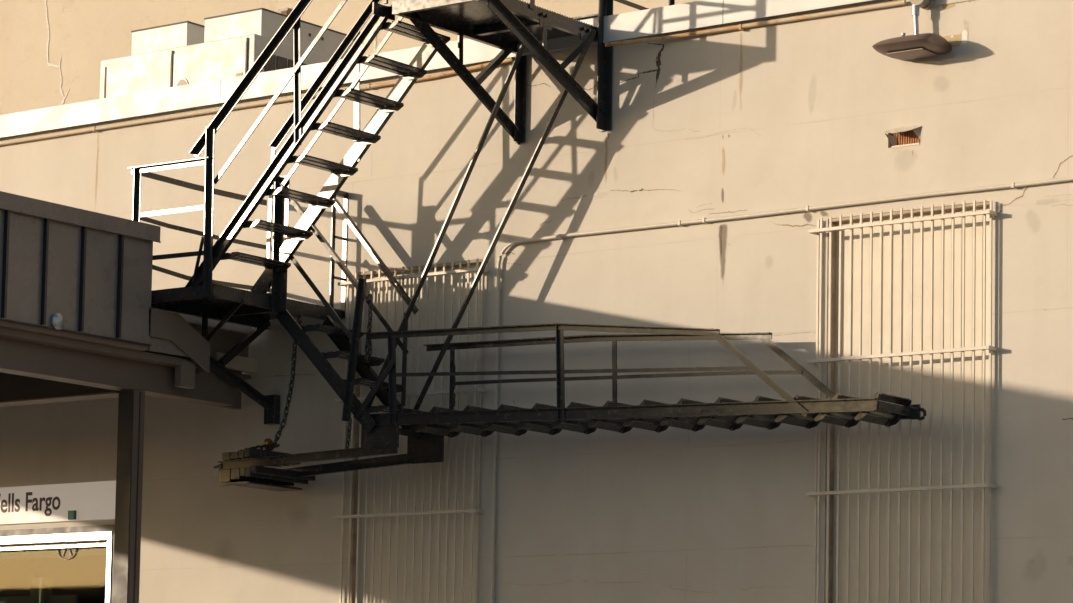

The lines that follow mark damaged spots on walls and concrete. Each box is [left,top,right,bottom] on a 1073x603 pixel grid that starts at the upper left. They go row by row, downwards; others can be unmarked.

crack [45,0,69,106]
crack [583,43,761,140]
crack [1000,155,1073,212]